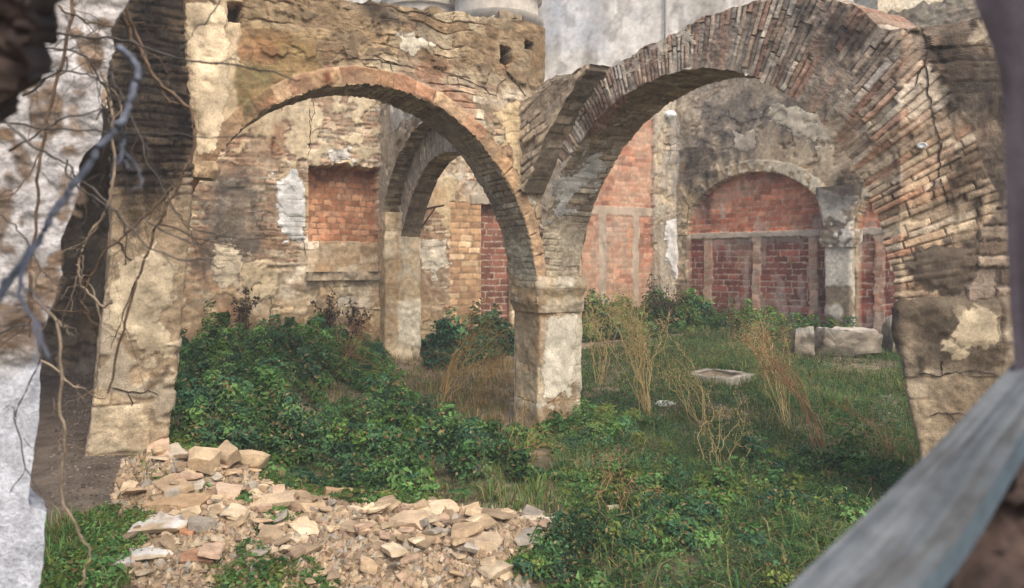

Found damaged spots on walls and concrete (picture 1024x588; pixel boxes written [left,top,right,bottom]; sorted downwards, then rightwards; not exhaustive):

peeling [396,31,436,56]
crack [319,46,526,96]
crack [915,30,950,210]
peeling [270,162,306,244]
peeling [659,212,679,281]
spalling [904,236,1000,360]
crack [917,361,999,377]